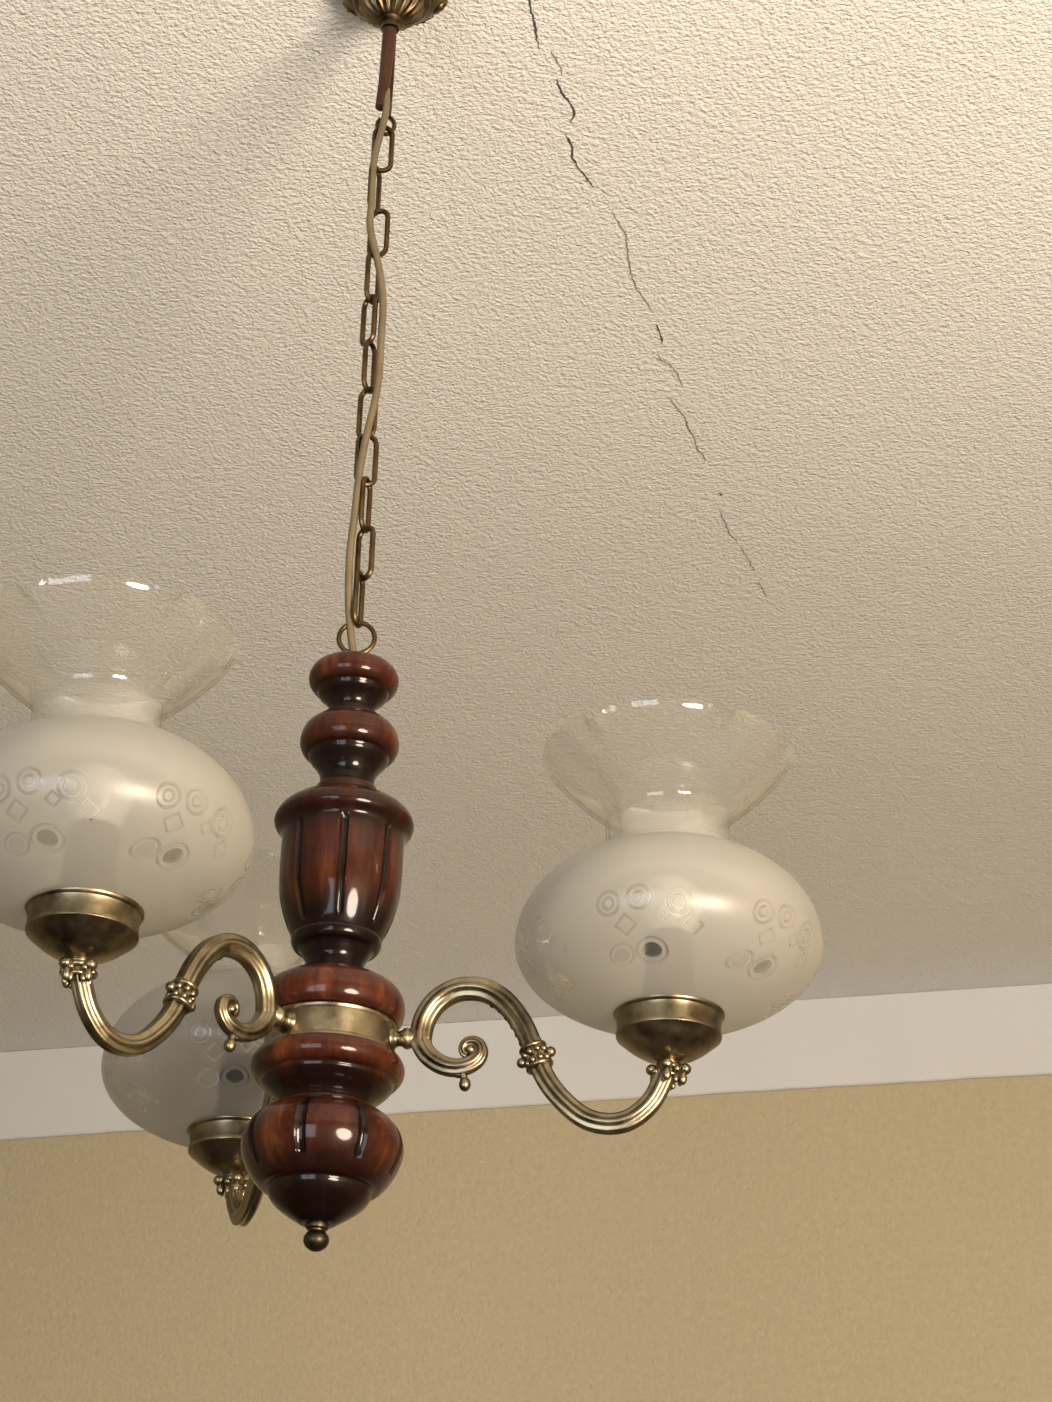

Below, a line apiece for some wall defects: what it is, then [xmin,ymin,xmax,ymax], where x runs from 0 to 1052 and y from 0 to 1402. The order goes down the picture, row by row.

crack [528,0,705,460]
crack [719,493,766,596]